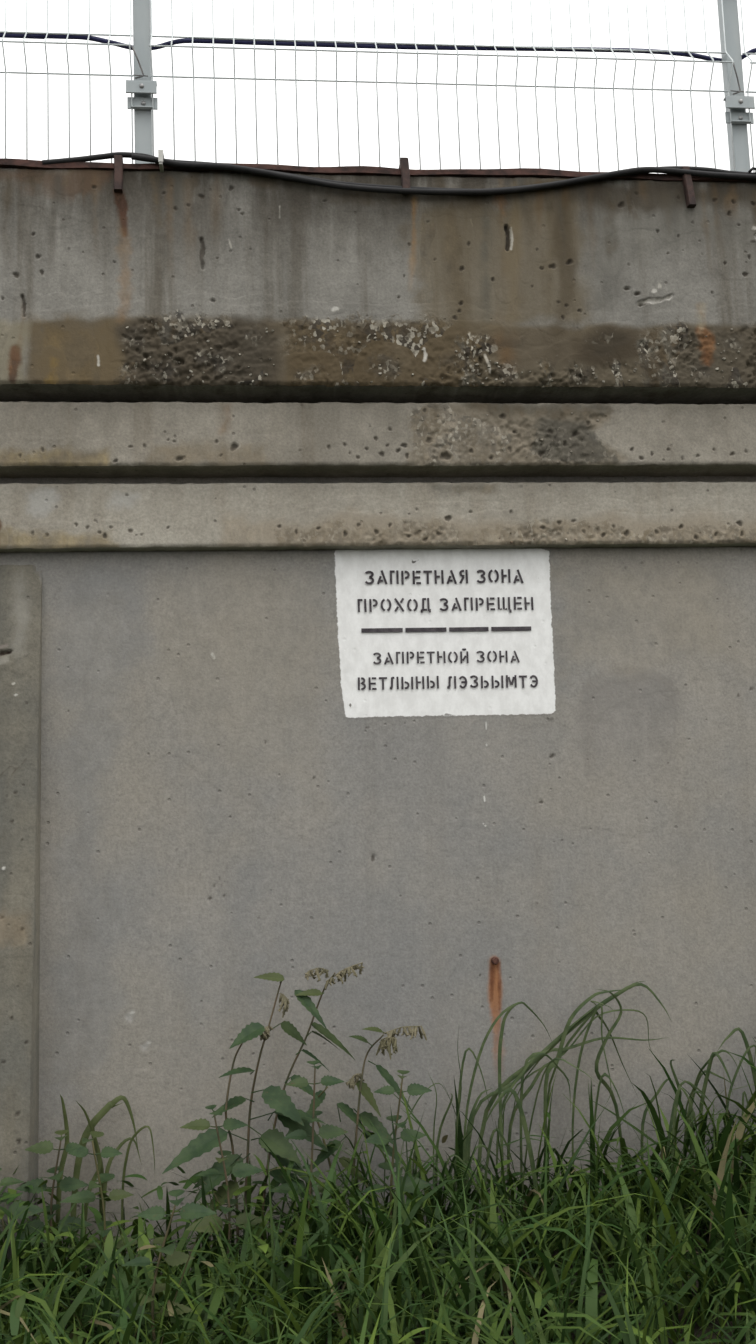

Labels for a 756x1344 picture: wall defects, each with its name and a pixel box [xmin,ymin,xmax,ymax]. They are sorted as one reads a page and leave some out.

spalling [0,230,46,320]
spalling [196,235,222,273]
water stain [0,167,756,385]
spalling [502,222,516,253]
spalling [710,196,756,279]
spalling [92,272,756,466]
rust [482,950,511,1092]